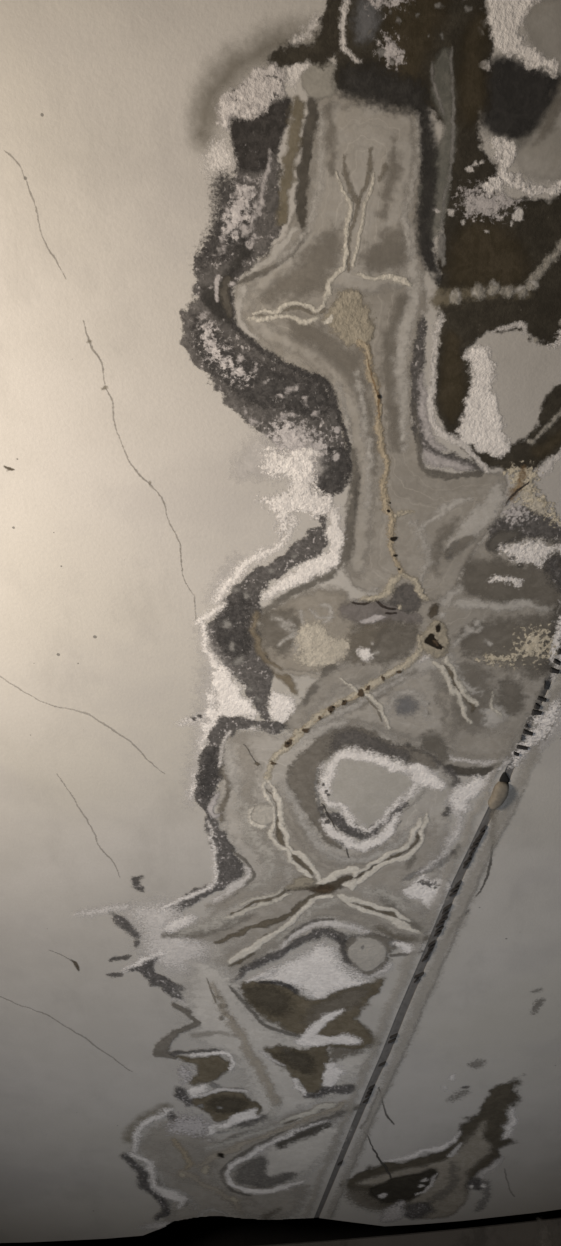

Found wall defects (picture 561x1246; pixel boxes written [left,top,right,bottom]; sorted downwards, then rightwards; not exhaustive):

crack [83,321,195,603]
leakage [73,0,561,1003]
peeling [503,460,561,528]
crack [0,676,165,774]
crack [171,148,503,1214]
spalling [419,620,450,663]
peeling [475,623,557,670]
crack [58,776,119,874]
crack [0,996,130,1071]
leakage [121,915,392,1231]
leakage [340,1080,520,1223]